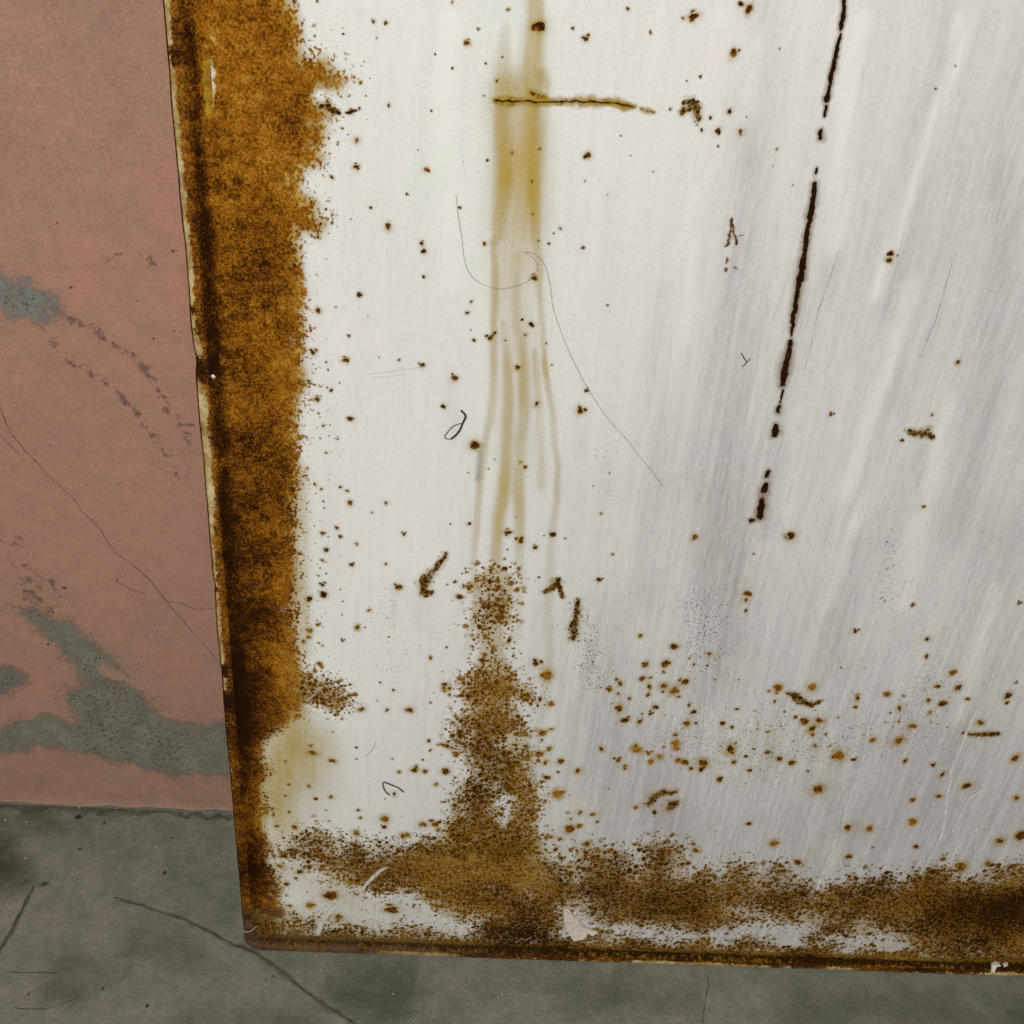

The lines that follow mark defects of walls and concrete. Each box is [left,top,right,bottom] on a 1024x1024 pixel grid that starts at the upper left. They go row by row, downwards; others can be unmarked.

corrosion [179,0,1024,972]